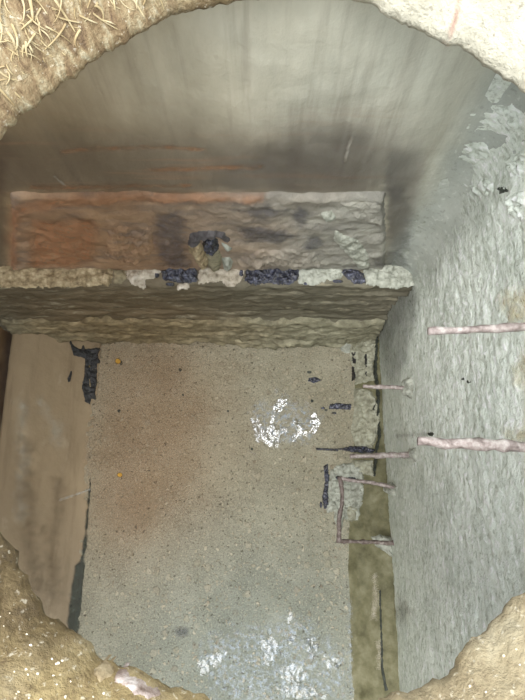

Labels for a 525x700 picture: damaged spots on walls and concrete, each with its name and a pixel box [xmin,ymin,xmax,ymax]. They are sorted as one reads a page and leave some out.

flaking render [466,103,525,137]
flaking render [458,142,492,165]
flaking render [463,178,525,221]
spalling [188,230,243,276]
peeling [350,339,380,449]
peeling [319,460,374,526]
crack [67,479,91,633]